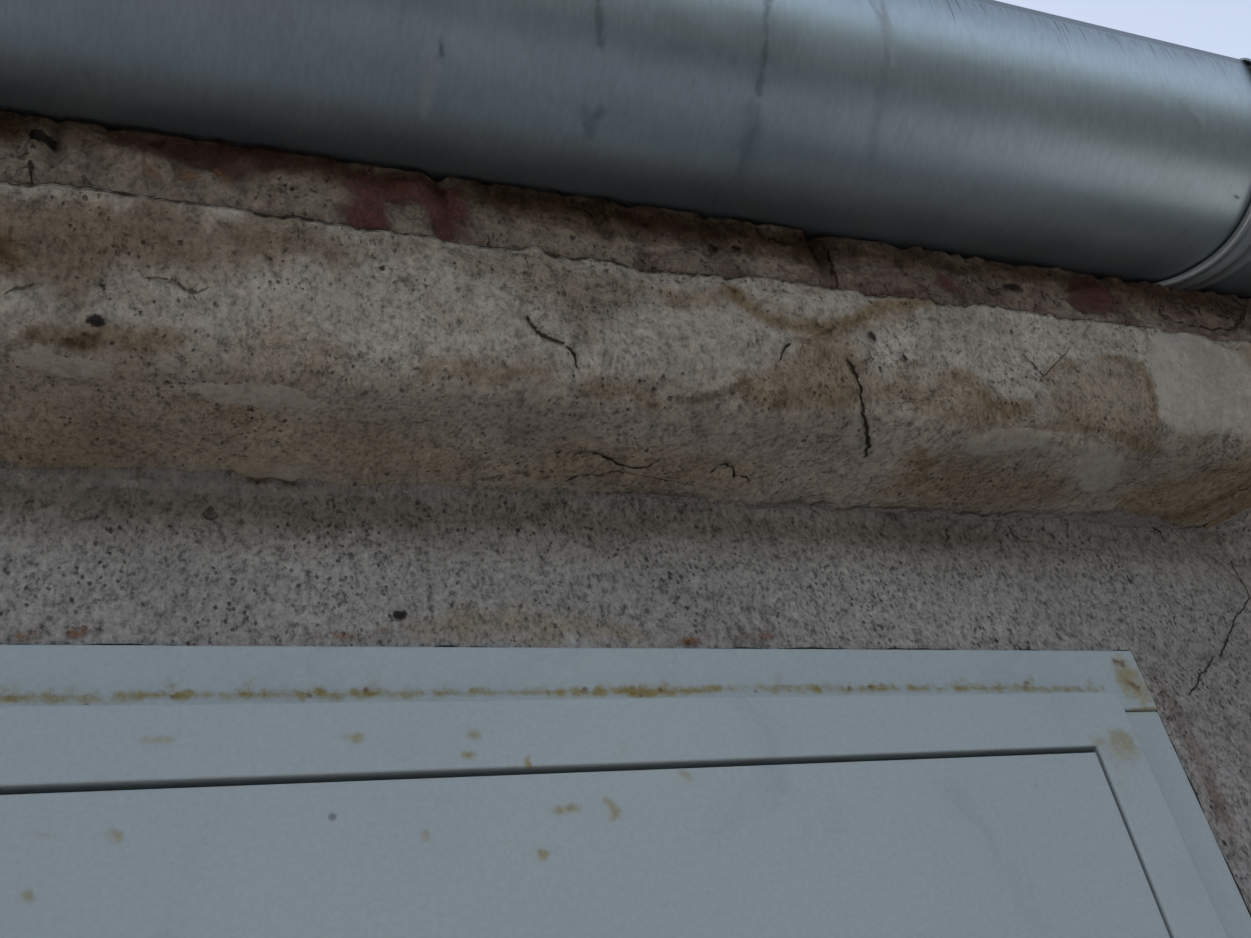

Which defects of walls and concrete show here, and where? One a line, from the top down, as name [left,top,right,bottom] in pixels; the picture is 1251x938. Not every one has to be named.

crack [846,357,872,458]
crack [1189,561,1250,695]